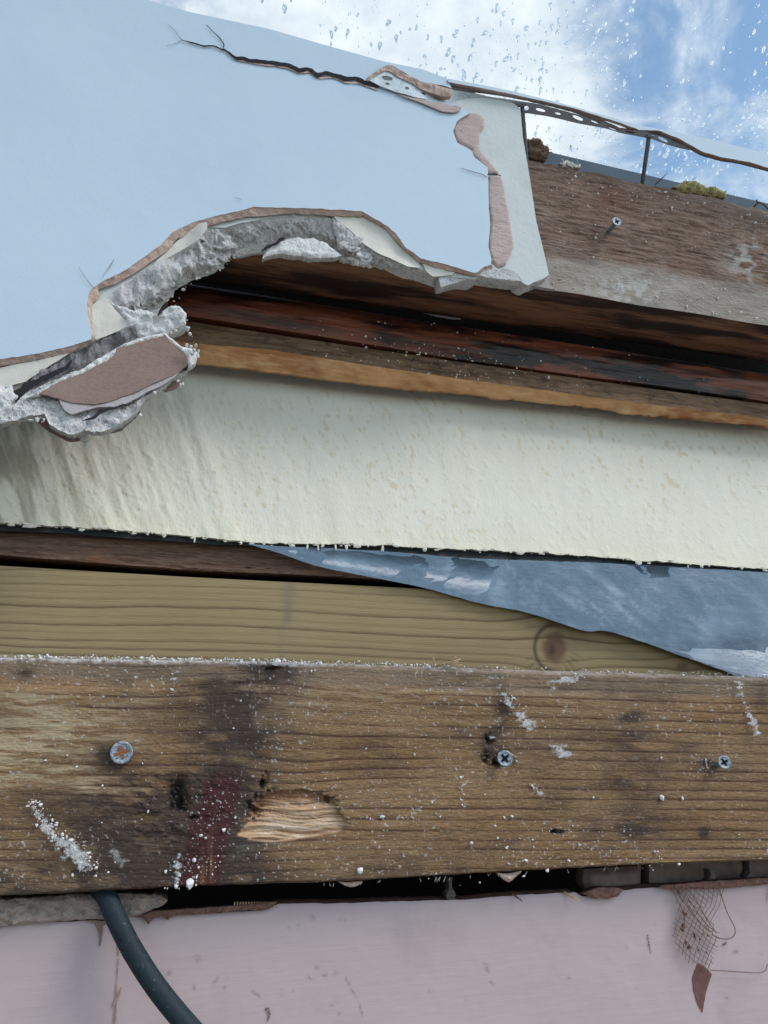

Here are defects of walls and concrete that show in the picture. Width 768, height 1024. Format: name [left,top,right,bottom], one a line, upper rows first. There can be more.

crack [166,24,379,90]
spalling [652,133,768,172]
spalling [0,65,635,388]